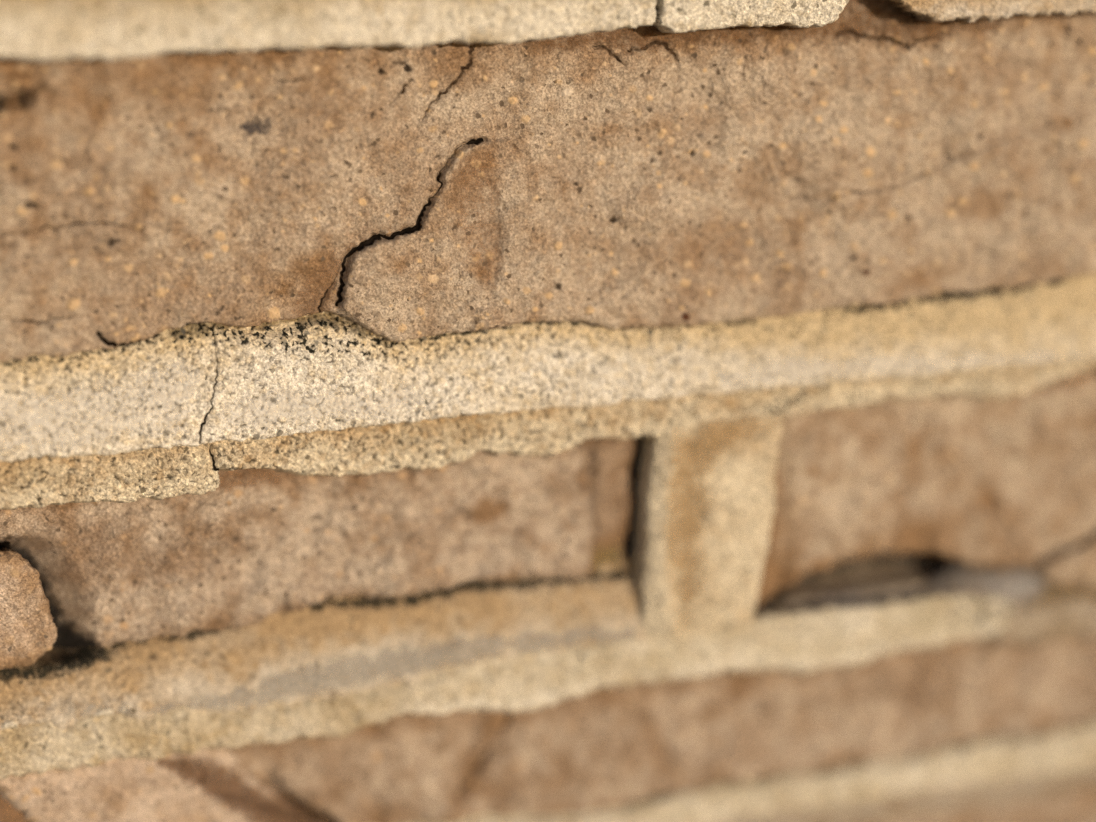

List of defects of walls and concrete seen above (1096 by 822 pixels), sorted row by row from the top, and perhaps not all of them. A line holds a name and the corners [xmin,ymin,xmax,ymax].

crack [594,0,676,64]
crack [318,138,484,313]
crack [199,334,219,471]